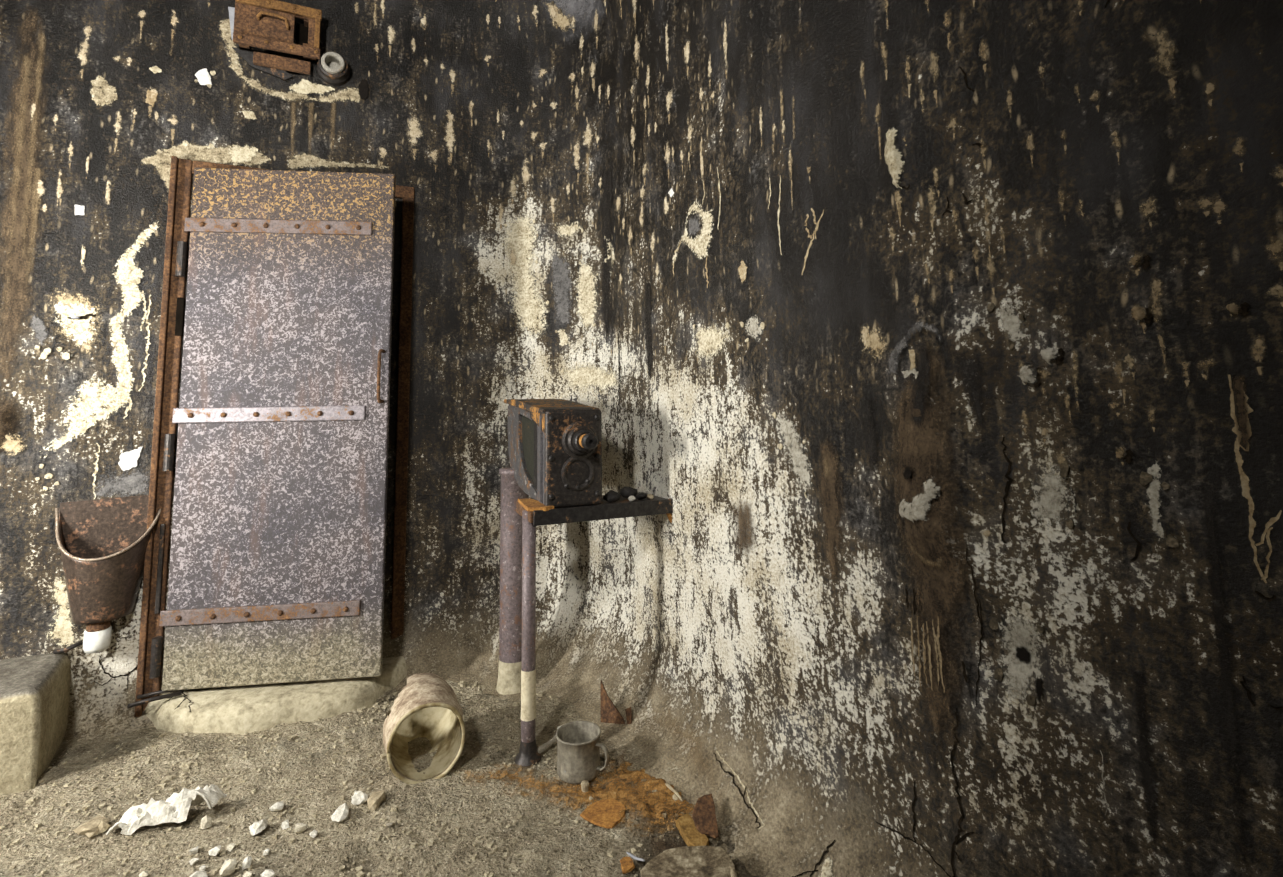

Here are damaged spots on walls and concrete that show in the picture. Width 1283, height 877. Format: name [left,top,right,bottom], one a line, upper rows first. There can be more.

leakage [699,22,727,107]
leakage [860,63,881,159]
leakage [905,13,951,114]
peeling [502,212,616,346]
spalling [672,201,714,288]
leakage [759,91,811,255]
leakage [927,168,940,233]
peeling [31,221,159,500]
peeling [693,315,765,360]
peeling [771,412,812,498]
crack [1001,437,1013,543]
crack [876,548,985,877]